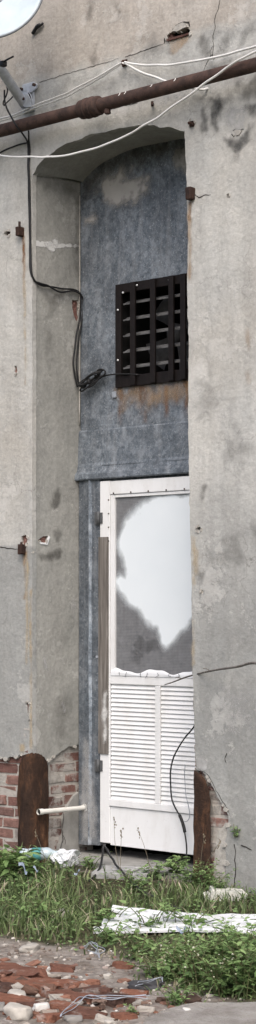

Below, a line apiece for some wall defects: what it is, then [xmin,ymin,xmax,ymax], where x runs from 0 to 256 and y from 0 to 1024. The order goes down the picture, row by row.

leakage [228,131,248,149]
flaking render [0,750,28,856]
flaking render [47,744,93,851]
flaking render [194,745,231,887]